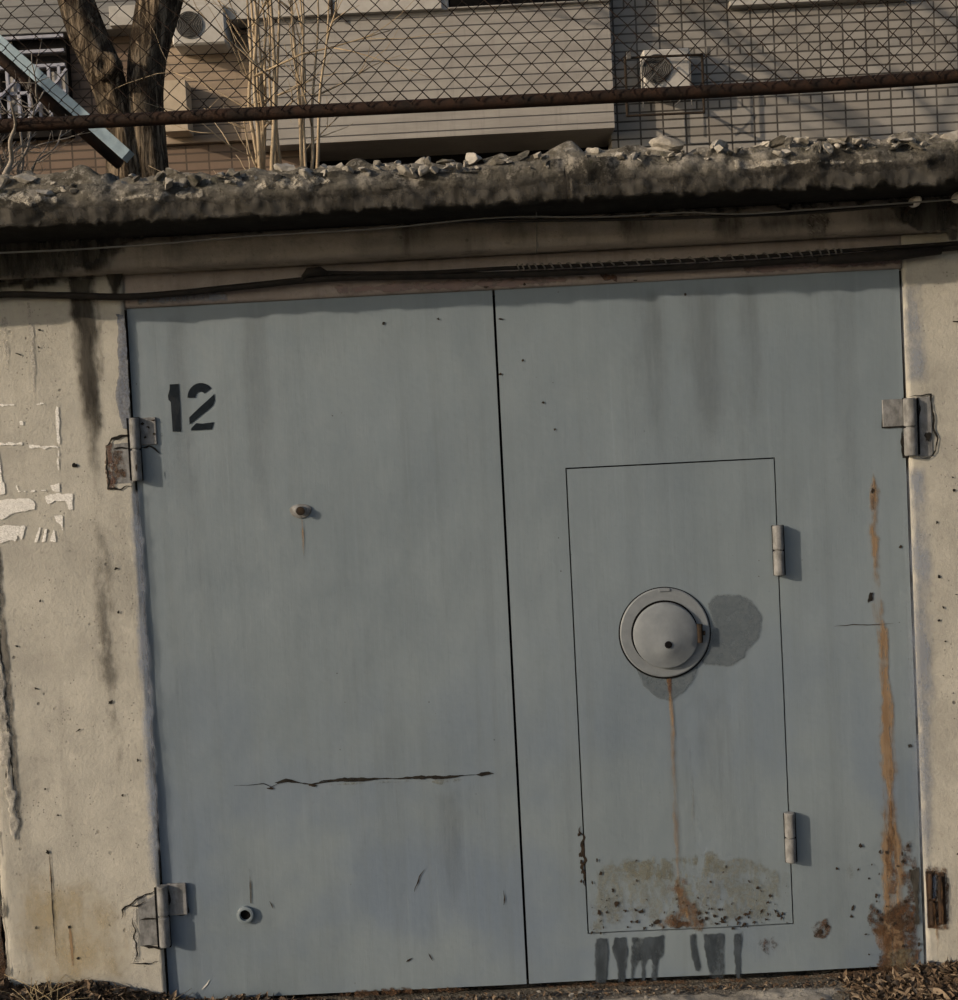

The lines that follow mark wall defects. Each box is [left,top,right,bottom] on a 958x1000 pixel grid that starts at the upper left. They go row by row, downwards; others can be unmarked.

damp [0,164,958,241]
damp [0,236,145,450]
rust [870,477,878,567]
damp [100,605,114,683]
crack [234,772,494,789]
rust [864,622,949,972]
peeling [591,878,788,934]